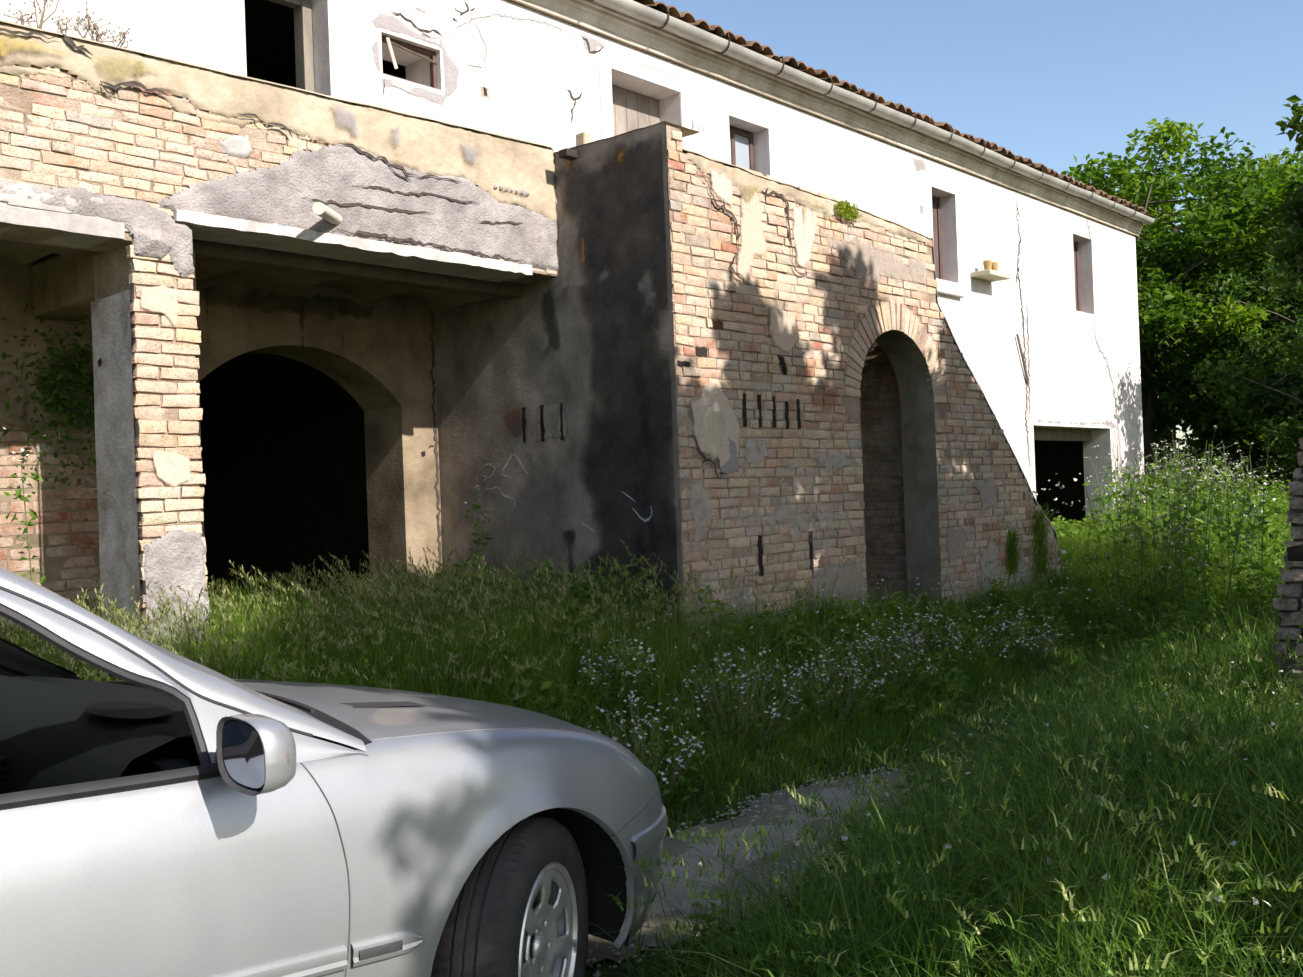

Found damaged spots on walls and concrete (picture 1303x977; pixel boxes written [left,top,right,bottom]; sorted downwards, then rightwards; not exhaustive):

crack [387,11,578,67]
peeling [0,183,108,214]
water stain [542,137,680,640]
crack [1016,197,1031,476]
crack [1093,318,1133,470]